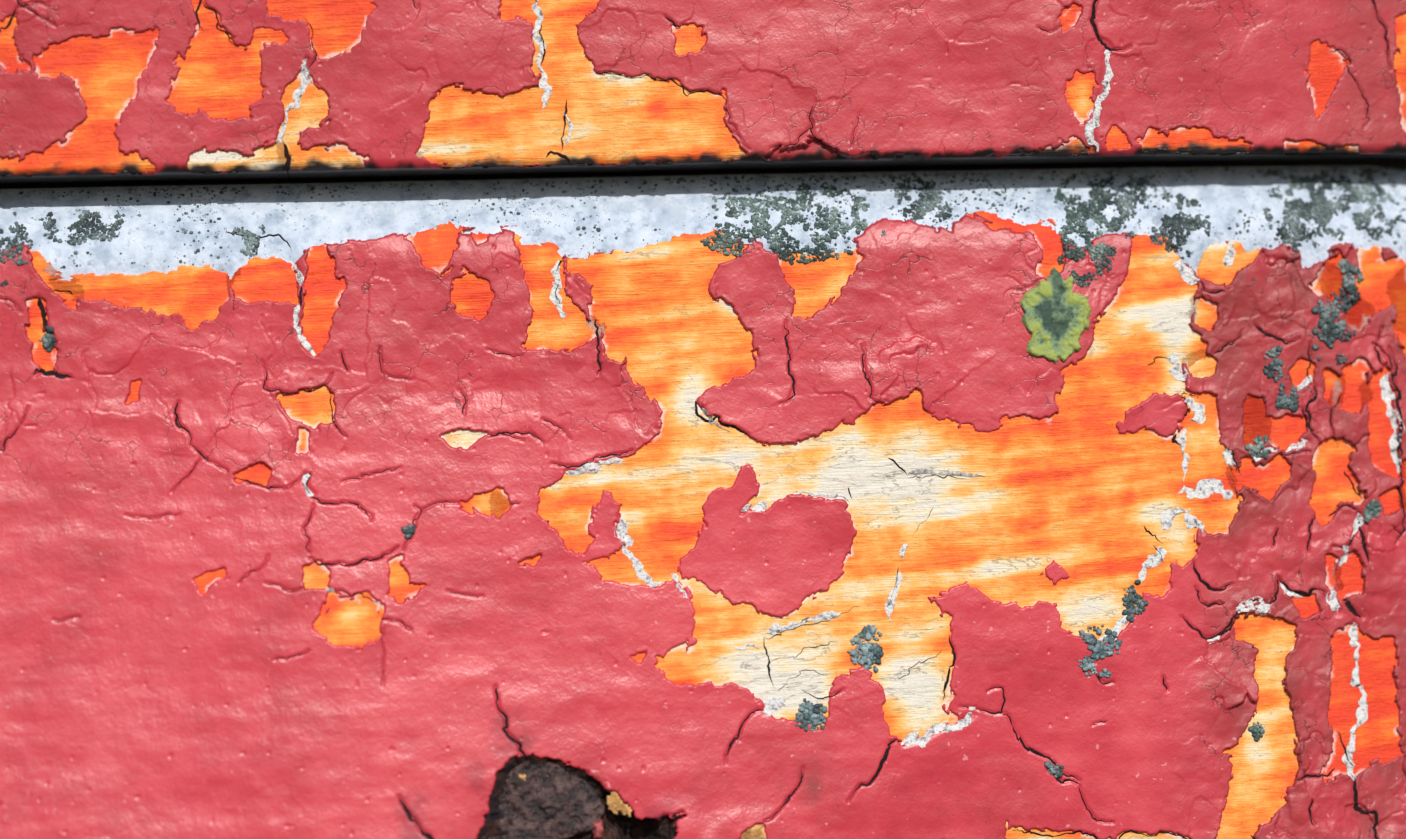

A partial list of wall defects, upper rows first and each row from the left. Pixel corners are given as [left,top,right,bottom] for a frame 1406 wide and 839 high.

peeling [187,72,369,172]
peeling [416,0,746,167]
crack [0,290,75,379]
peeling [26,244,346,371]
crack [226,230,412,436]
crack [550,256,601,371]
crack [127,402,461,686]
crack [460,391,634,476]
crack [614,517,688,598]
peeling [514,229,1306,744]
peeling [1215,552,1363,839]
peeling [1321,624,1402,783]